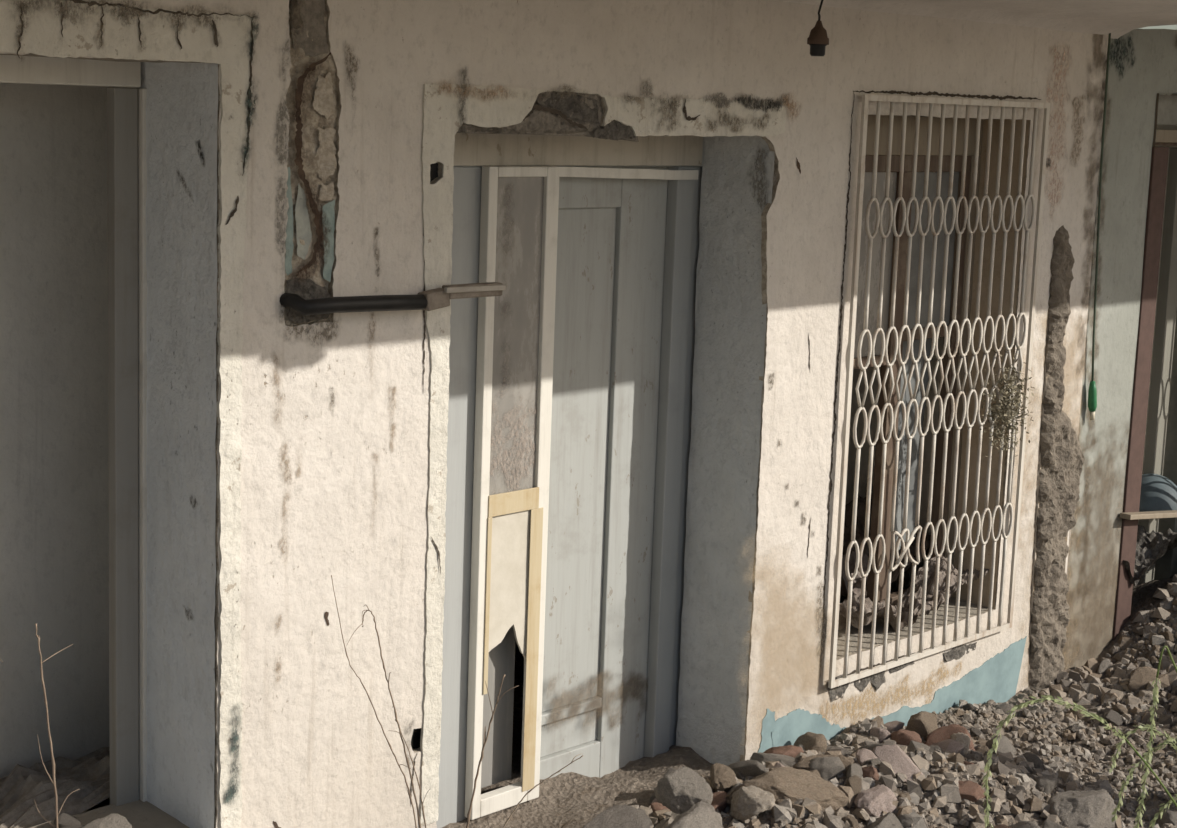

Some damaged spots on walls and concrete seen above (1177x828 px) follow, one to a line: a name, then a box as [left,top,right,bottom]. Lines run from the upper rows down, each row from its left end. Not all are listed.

spalling [284,0,338,326]
spalling [536,93,636,141]
peeling [757,636,1027,753]